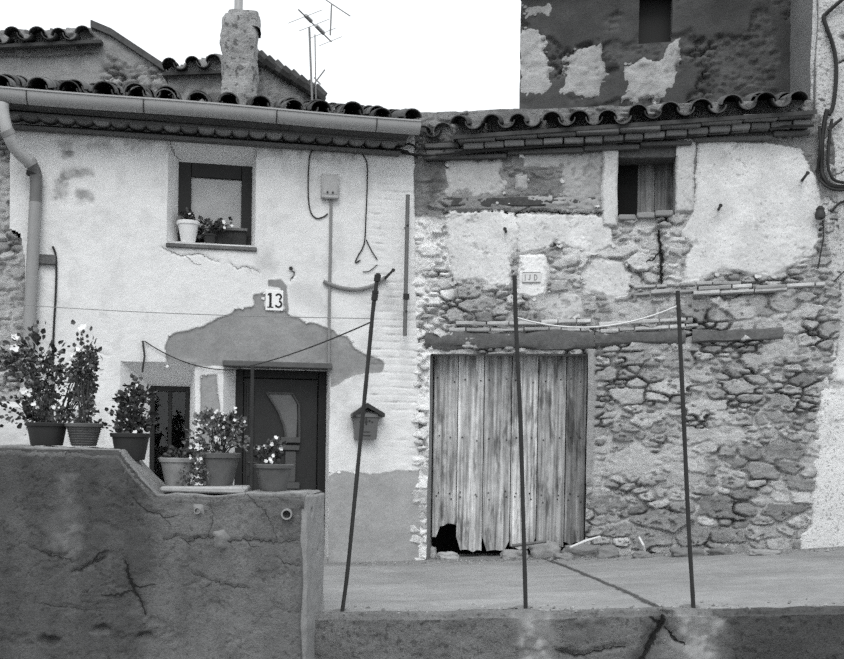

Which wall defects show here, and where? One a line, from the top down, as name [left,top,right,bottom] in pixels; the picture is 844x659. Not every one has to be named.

spalling [520,3,609,100]
spalling [621,38,681,105]
peeling [443,144,632,319]